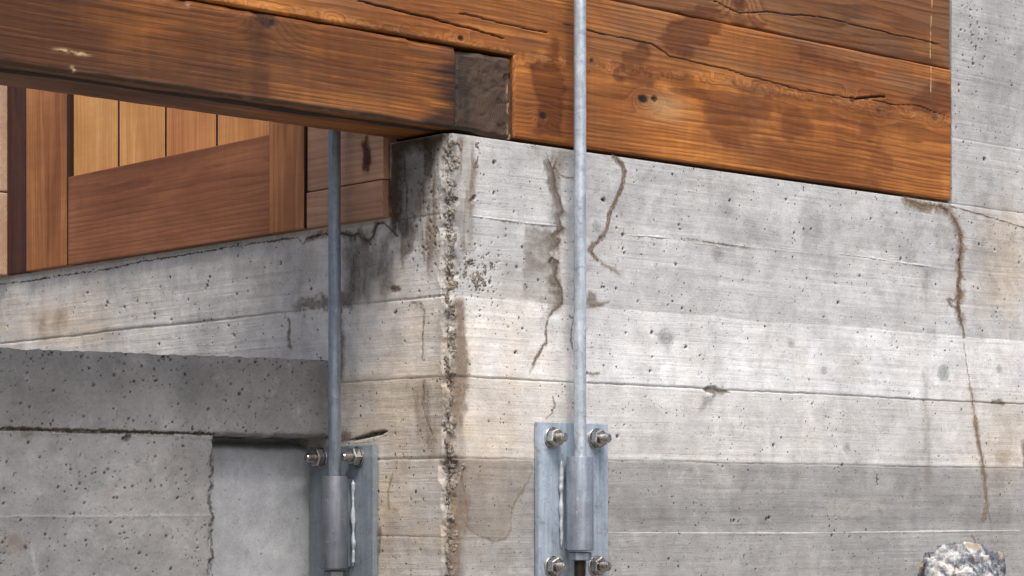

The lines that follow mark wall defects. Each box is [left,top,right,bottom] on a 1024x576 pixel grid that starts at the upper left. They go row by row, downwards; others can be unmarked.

crack [0,221,398,291]
damp [299,296,328,310]
damp [381,134,443,291]
spalling [441,140,493,576]
damp [466,157,475,212]
crack [533,158,574,364]
crack [588,155,627,270]
crack [903,196,1024,337]
crack [0,426,215,439]
crack [966,363,991,539]